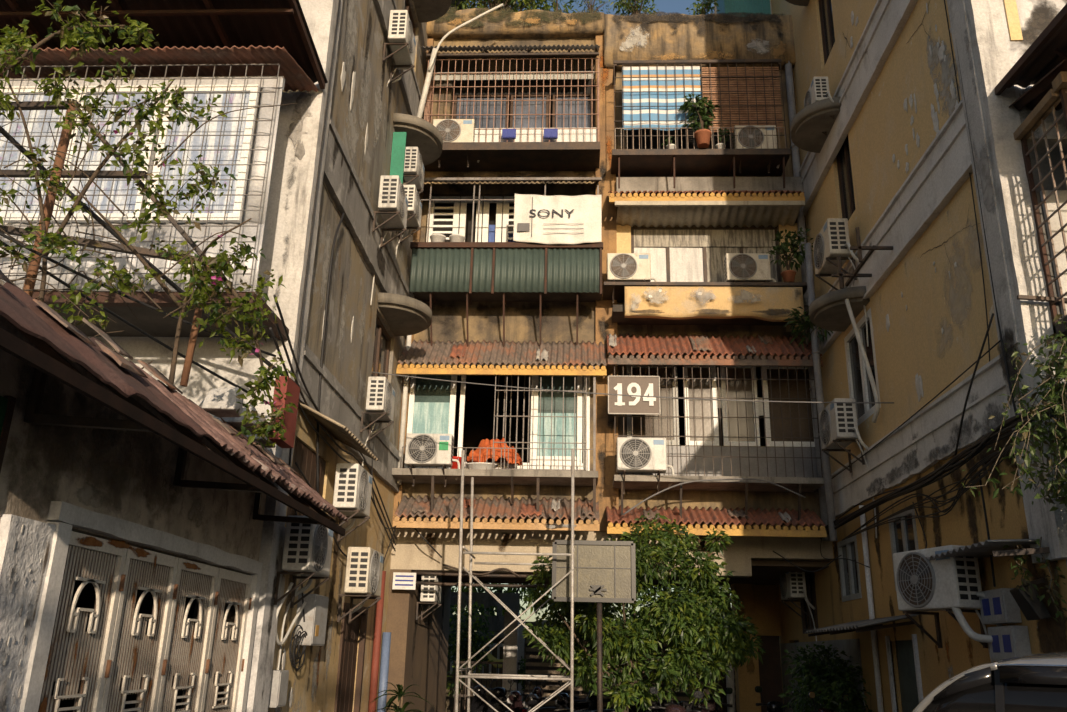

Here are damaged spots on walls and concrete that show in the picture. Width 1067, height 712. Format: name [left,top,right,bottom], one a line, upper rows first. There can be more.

peeling [620,27,649,51]
mould [1021,0,1057,52]
peeling [631,288,668,310]
damp [867,404,1021,567]
corrosion [77,537,157,569]
damp [1022,531,1067,653]
corrosion [38,644,53,712]